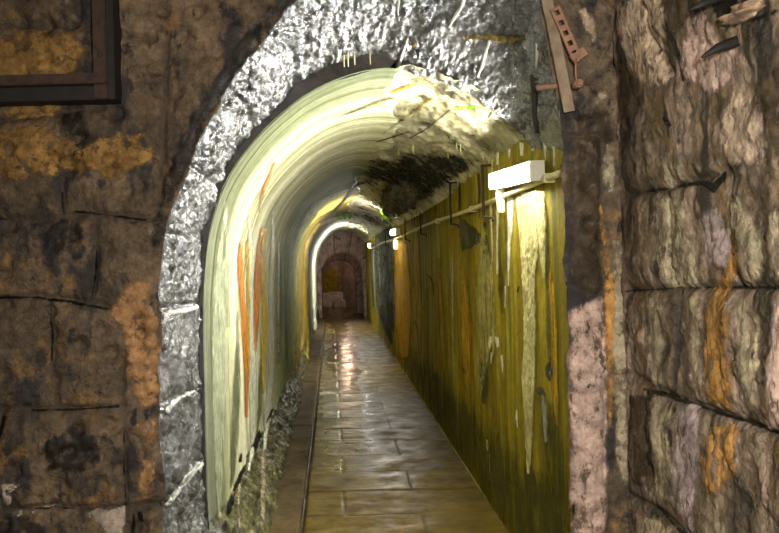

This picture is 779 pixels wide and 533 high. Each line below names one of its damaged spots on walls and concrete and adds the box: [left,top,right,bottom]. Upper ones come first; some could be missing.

leakage [362,154,558,474]
corrosion [703,238,738,409]
corrosion [700,423,737,495]